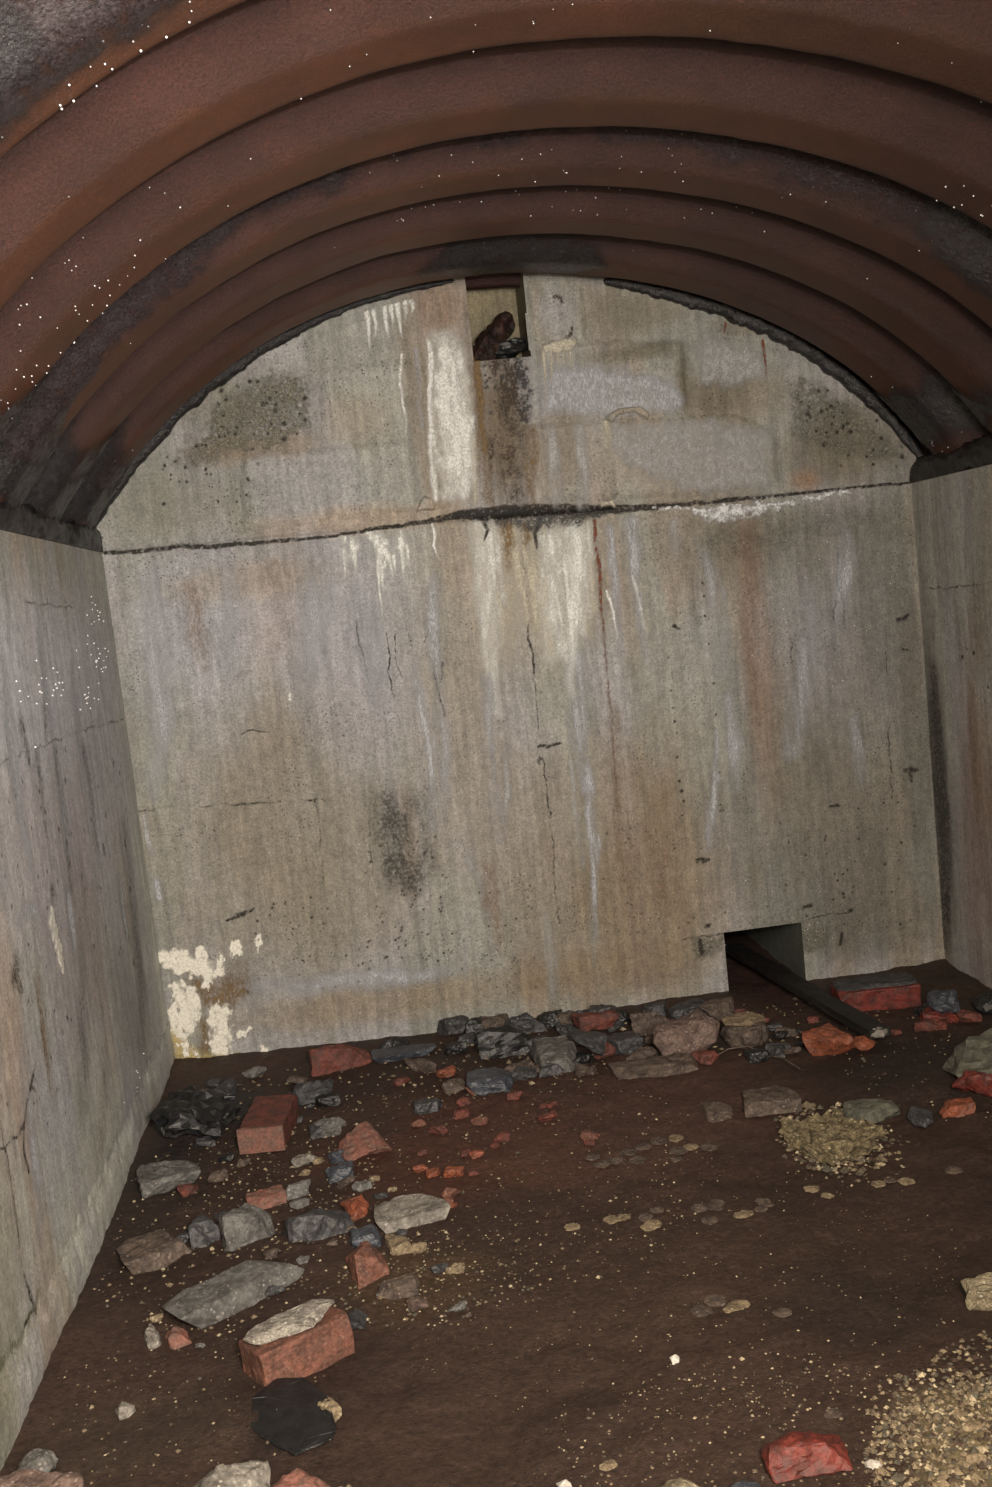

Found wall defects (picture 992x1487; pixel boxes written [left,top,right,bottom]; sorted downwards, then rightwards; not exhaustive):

damp [420,234,606,278]
damp [364,300,415,346]
rust [474,361,487,460]
rust [502,520,530,558]
rust [593,519,604,631]
damp [398,332,851,919]
damp [835,536,855,618]
crack [103,482,911,923]
damp [383,802,418,887]
crack [1,1072,34,1174]